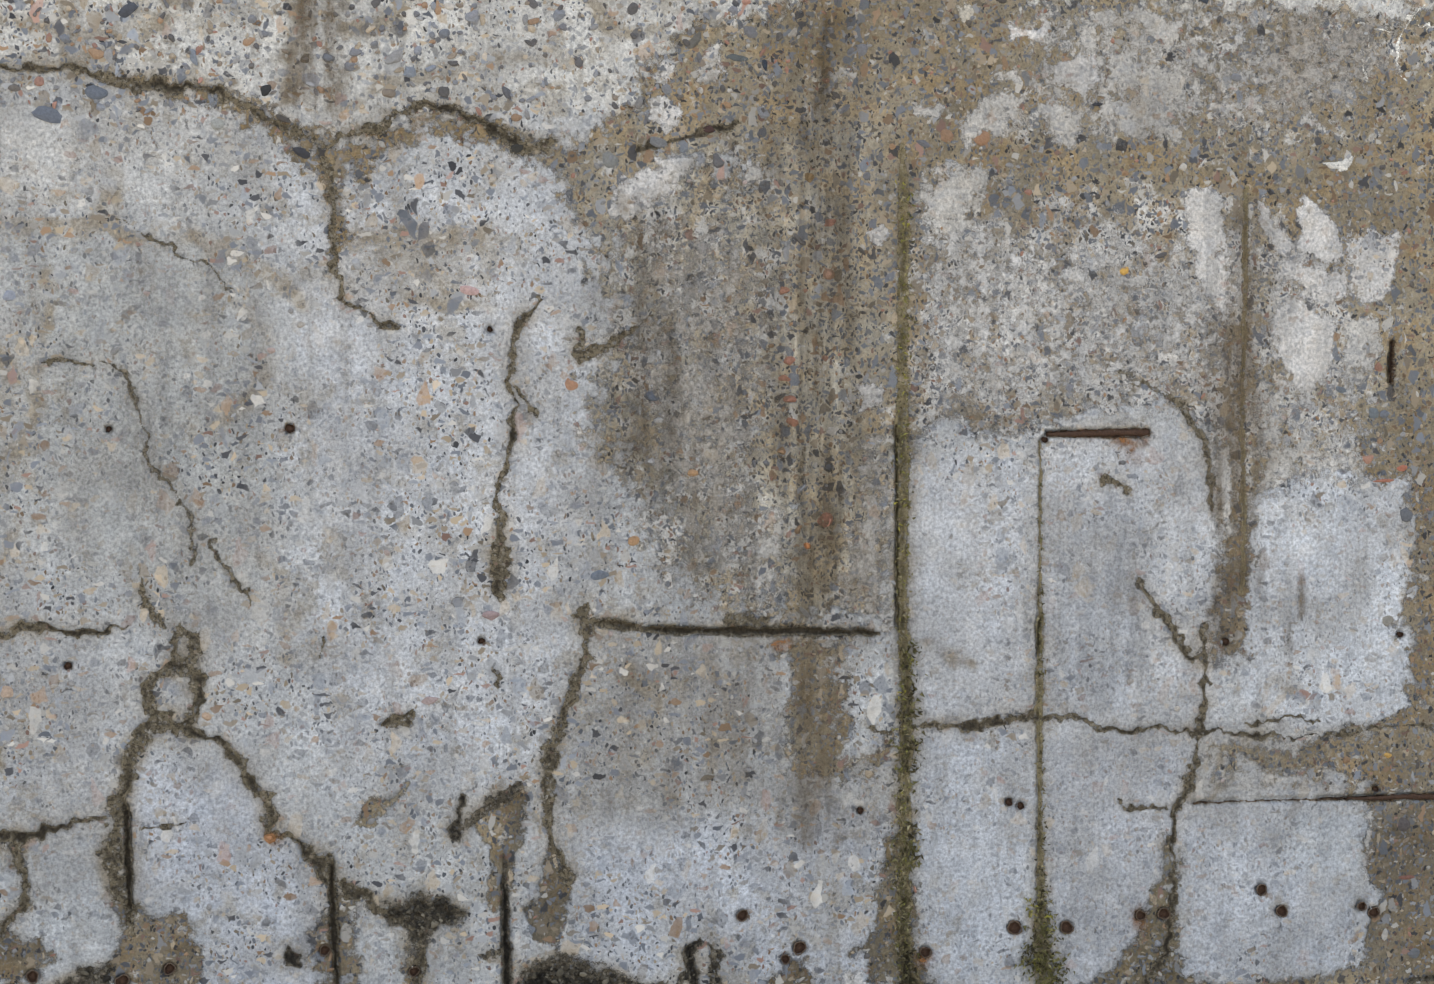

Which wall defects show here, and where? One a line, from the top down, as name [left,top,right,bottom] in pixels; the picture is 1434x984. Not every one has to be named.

crack [0,61,559,330]
crack [636,119,741,153]
crack [41,357,251,606]
crack [489,295,543,602]
water stain [797,443,841,608]
spalling [495,0,1434,984]
corrosion [1046,428,1151,451]
crack [0,569,429,984]
crack [539,602,597,888]
crack [867,577,1434,984]
spalling [92,901,205,984]
spalling [283,893,364,984]